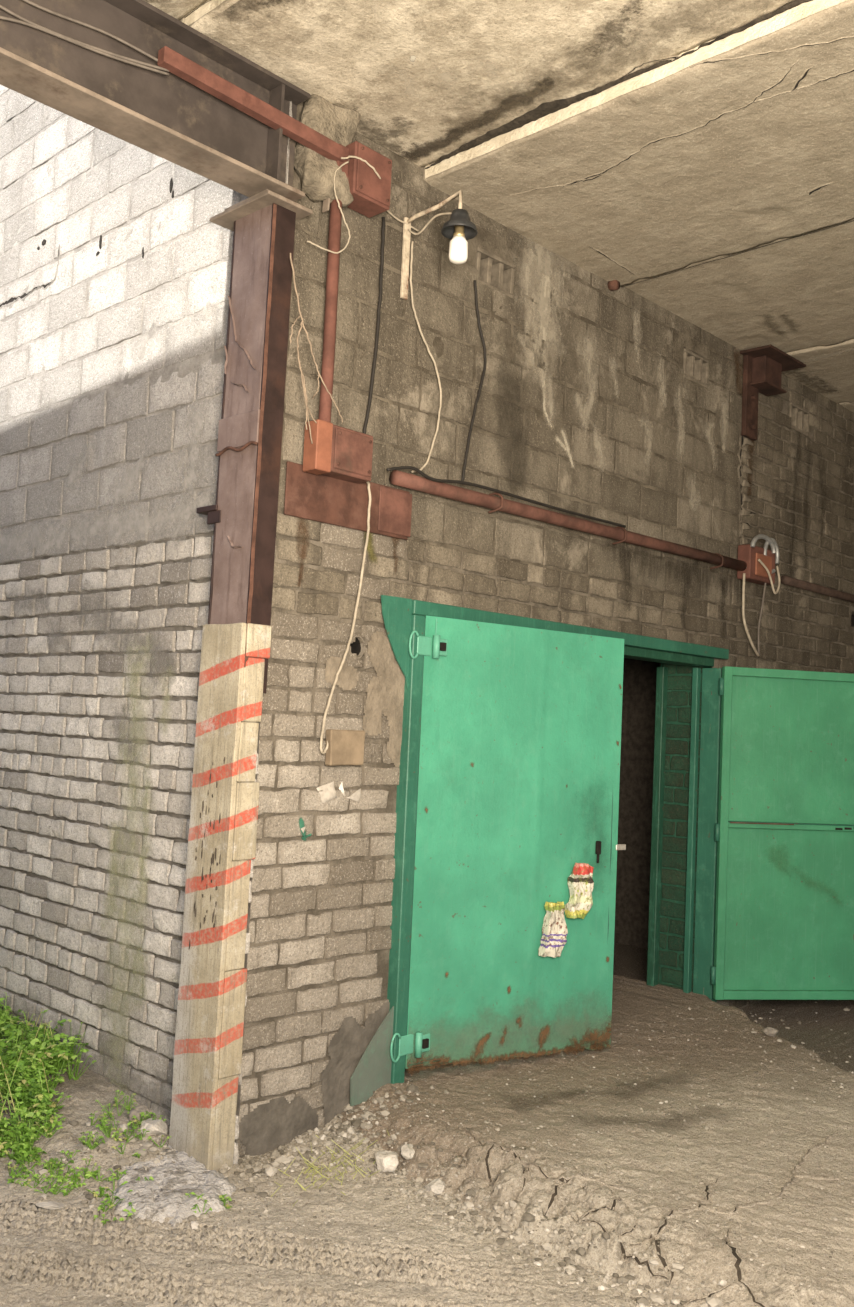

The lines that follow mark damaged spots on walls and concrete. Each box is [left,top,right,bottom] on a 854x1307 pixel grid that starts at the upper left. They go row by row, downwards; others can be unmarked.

crack [510,36,854,196]
water stain [498,374,524,491]
water stain [520,243,574,467]
water stain [576,338,603,467]
water stain [659,367,684,453]
water stain [705,401,727,460]
corrosion [407,1021,612,1074]